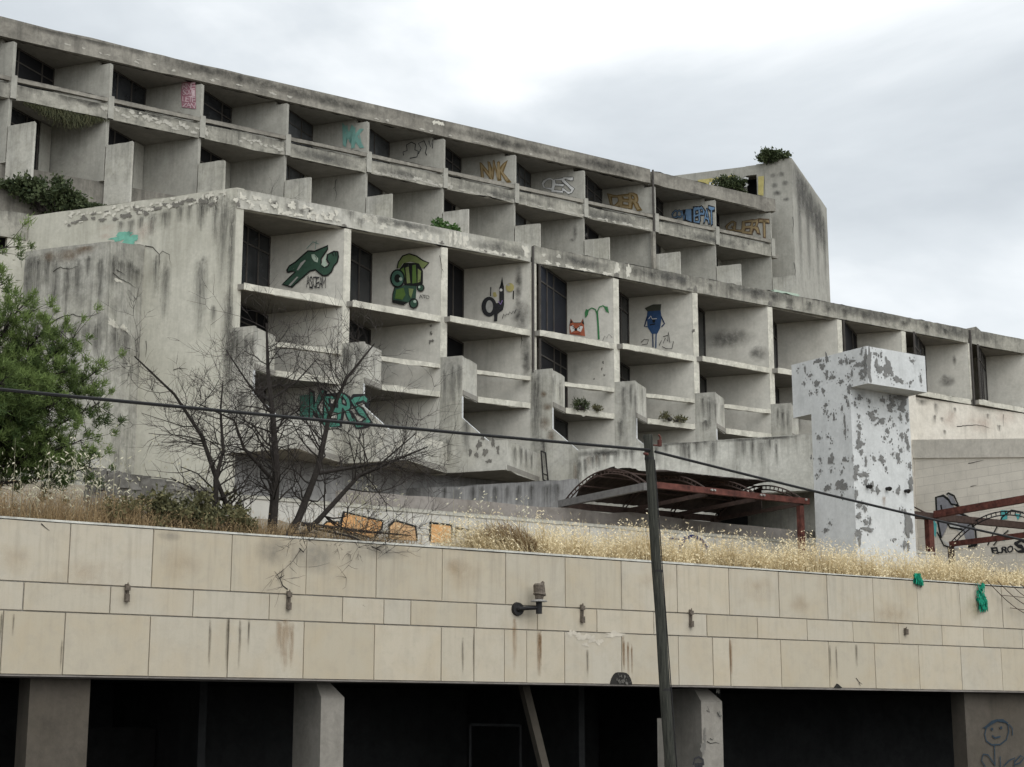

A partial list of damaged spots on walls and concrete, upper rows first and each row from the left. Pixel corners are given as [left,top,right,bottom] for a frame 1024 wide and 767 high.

peeling [100,105,209,136]
peeling [64,190,347,244]
peeling [469,437,499,463]
peeling [796,346,922,551]